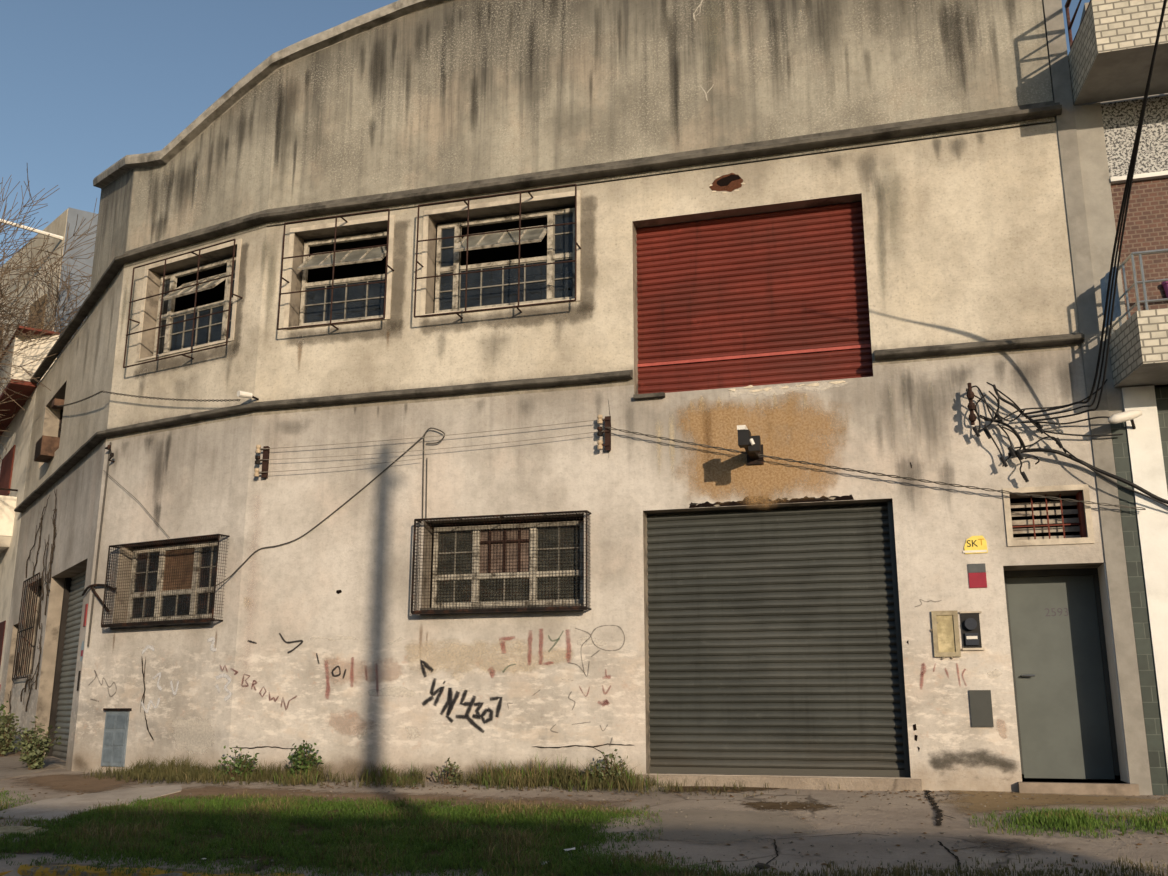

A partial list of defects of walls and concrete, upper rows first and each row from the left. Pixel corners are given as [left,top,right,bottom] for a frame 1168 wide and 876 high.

flaking render [728,380,849,397]
spalling [689,494,854,508]
leakage [931,751,1015,771]
crack [925,790,1009,872]